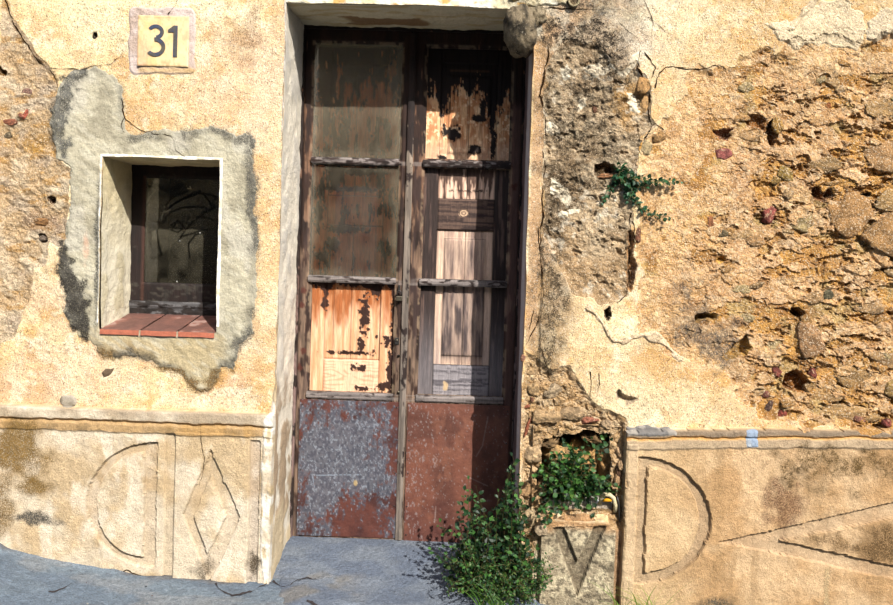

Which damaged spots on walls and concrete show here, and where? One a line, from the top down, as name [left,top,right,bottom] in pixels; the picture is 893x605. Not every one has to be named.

crack [5,0,124,88]
damp [532,17,632,220]
crack [621,0,720,153]
spalling [542,0,893,437]
damp [0,418,58,536]